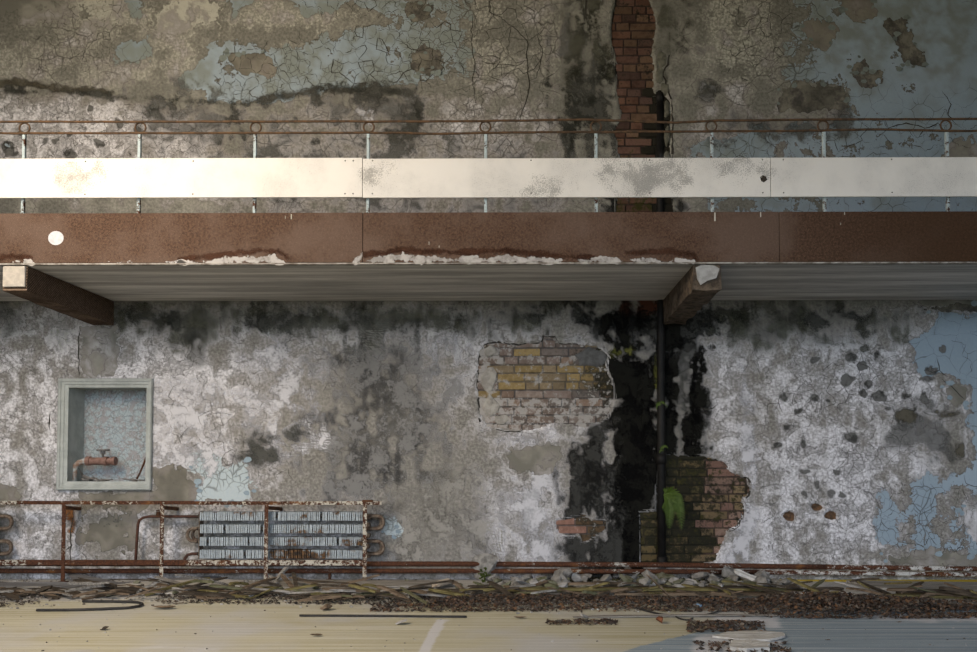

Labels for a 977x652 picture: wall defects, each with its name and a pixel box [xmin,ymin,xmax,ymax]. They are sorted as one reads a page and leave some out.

crack [35,0,123,74]
leakage [544,0,620,158]
spalling [611,0,674,158]
crack [719,0,795,94]
crack [0,97,217,159]
spalling [616,197,673,212]
leakage [166,247,288,266]
leakage [352,246,699,265]
spalling [476,335,614,432]
leakage [114,300,925,579]
crack [756,341,977,560]
spalling [640,454,751,563]